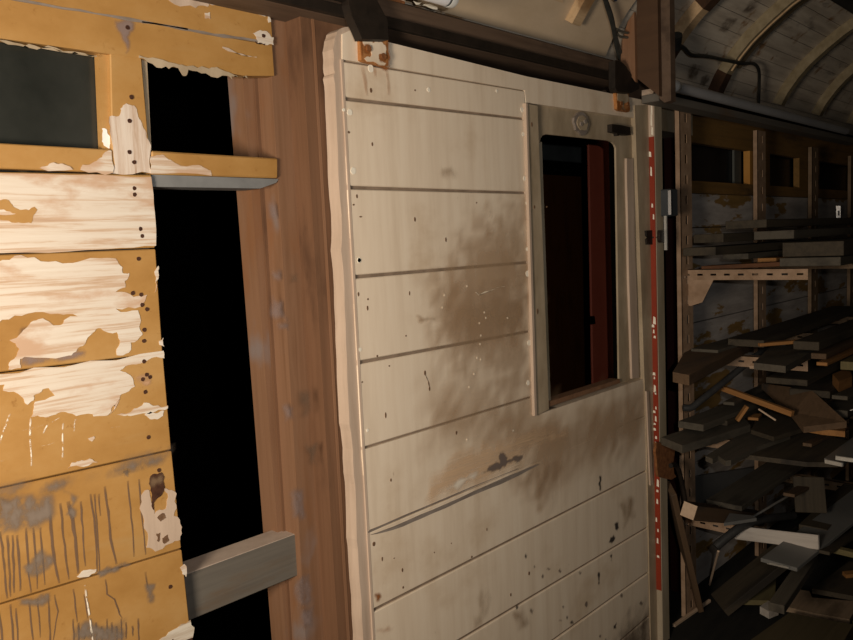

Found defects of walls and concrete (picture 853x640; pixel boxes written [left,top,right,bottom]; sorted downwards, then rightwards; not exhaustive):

peeling [169,0,212,19]
peeling [253,15,274,45]
peeling [0,40,97,57]
peeling [139,55,247,79]
peeling [0,103,212,419]
peeling [140,472,182,552]
crack [368,464,540,535]